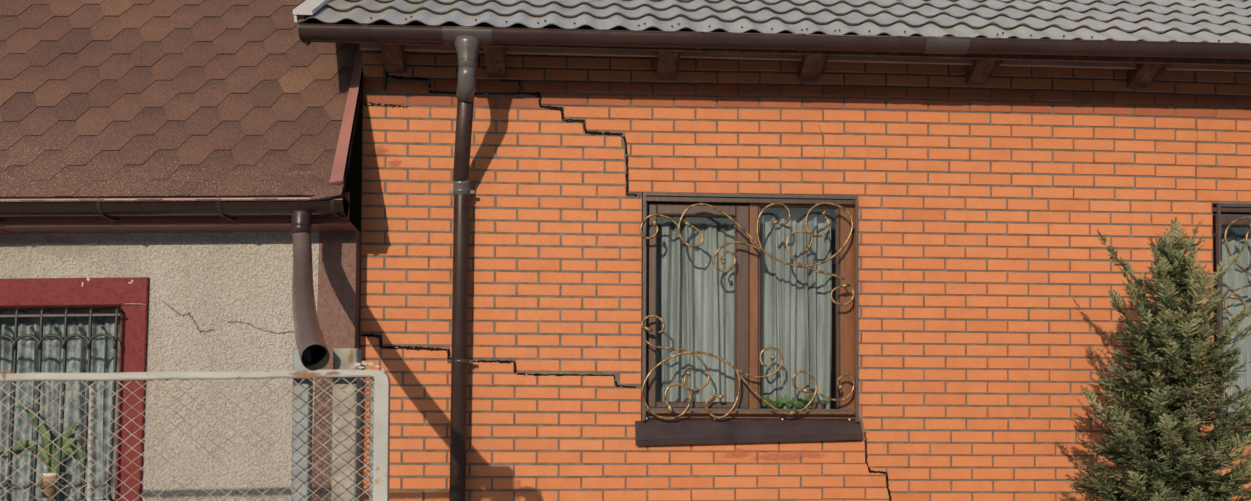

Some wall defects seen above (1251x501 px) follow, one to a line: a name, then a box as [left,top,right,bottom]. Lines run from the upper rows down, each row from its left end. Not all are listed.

crack [363,69,640,197]
crack [125,301,295,334]
crack [361,333,636,388]
crack [864,432,892,501]